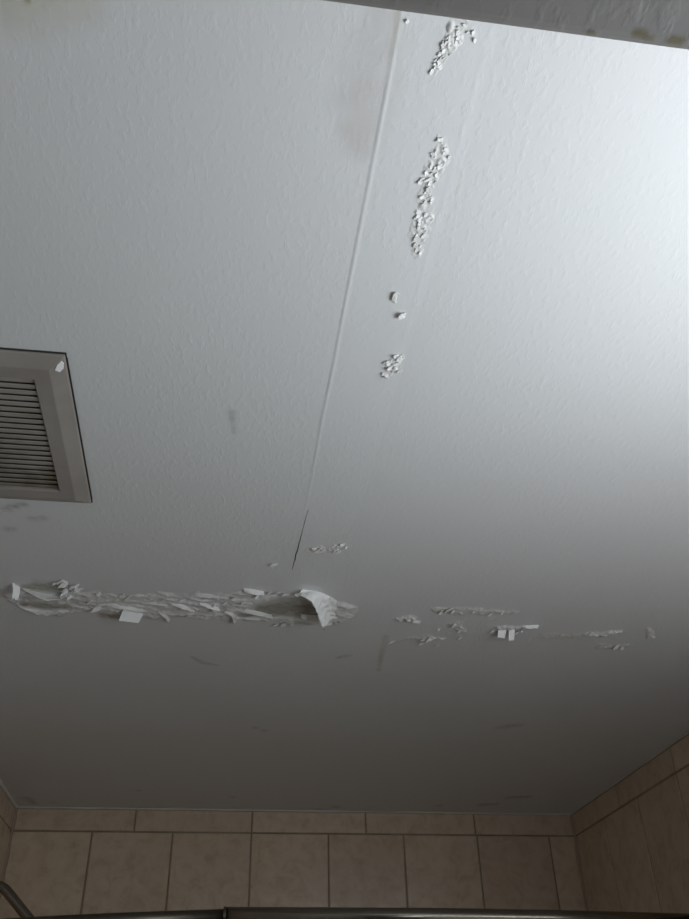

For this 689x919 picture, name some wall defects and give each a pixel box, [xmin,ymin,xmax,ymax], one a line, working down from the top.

peeling [3,579,359,631]
peeling [383,606,635,650]